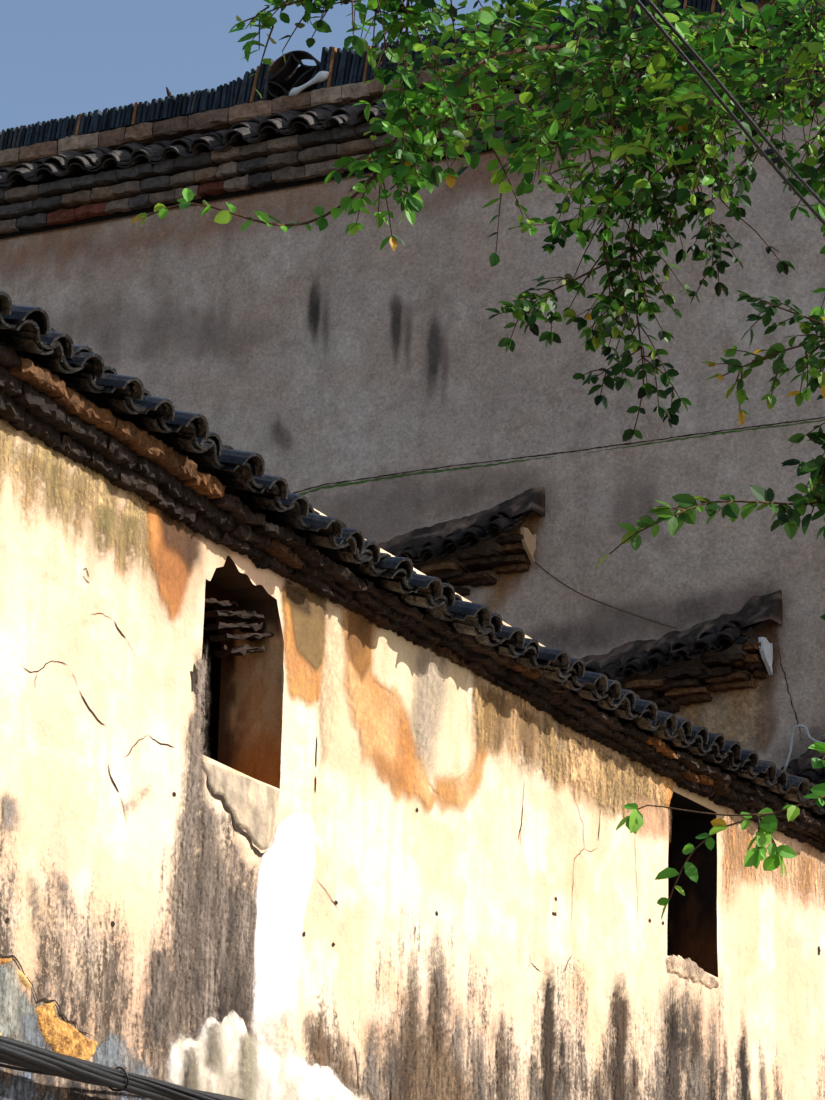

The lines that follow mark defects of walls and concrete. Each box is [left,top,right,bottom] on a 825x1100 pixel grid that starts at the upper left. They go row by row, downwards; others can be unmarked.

leakage [308,284,328,337]
rust [148,502,201,618]
crack [20,660,107,727]
rust [343,611,491,811]
leakage [0,794,20,829]
crack [108,735,173,822]
leakage [144,655,508,1100]
flaking render [0,954,153,1077]
leakage [0,1071,153,1100]
leakage [529,973,568,1100]
leakage [594,981,639,1100]
leakage [654,983,768,1100]